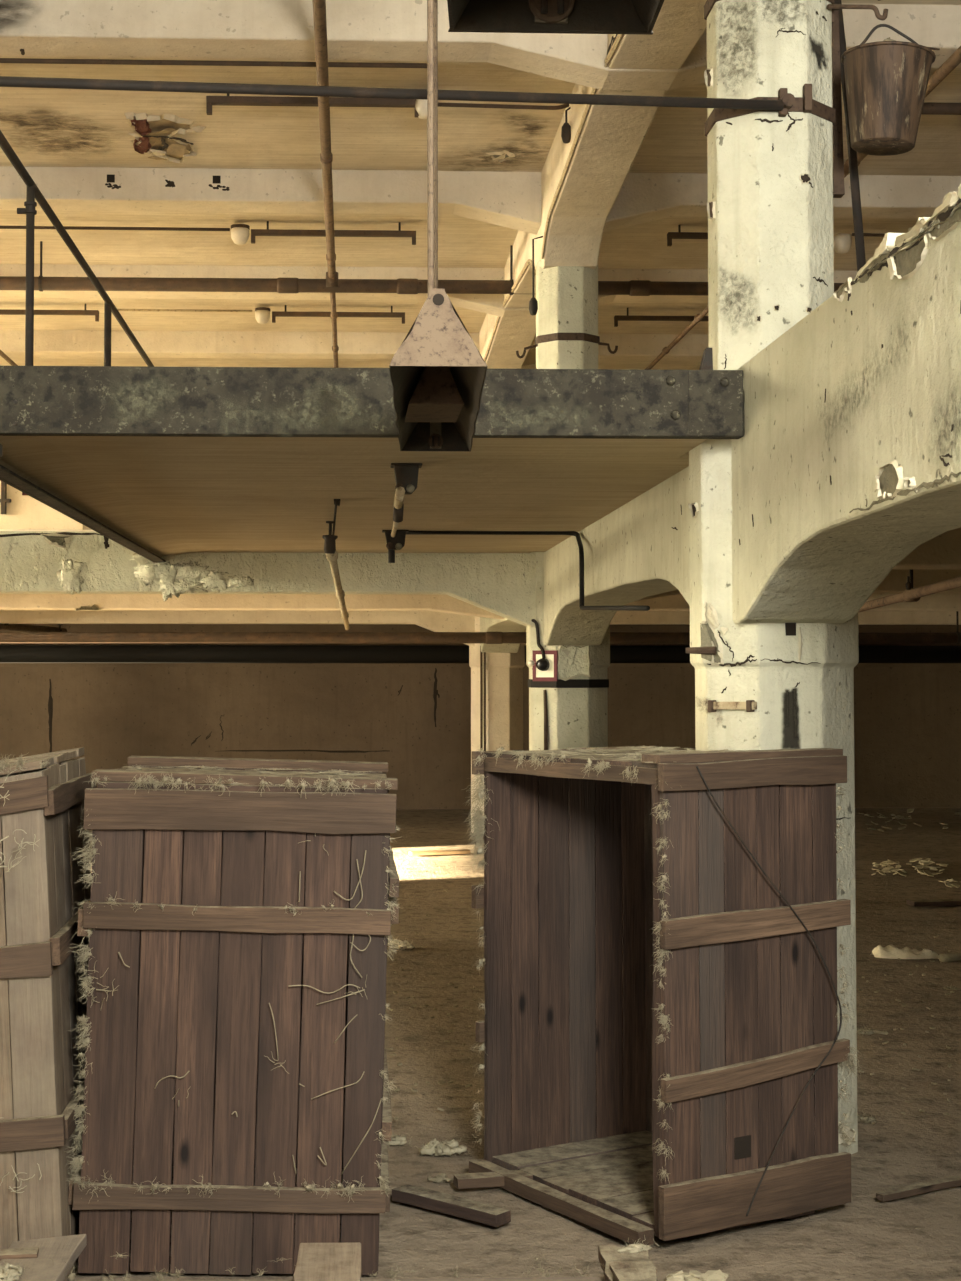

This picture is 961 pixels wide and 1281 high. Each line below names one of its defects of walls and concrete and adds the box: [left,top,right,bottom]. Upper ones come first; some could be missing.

water stain [0,3,23,25]
water stain [3,116,100,149]
spalling [125,112,206,163]
spalling [833,185,961,315]
crack [849,453,961,513]
crack [708,631,820,693]